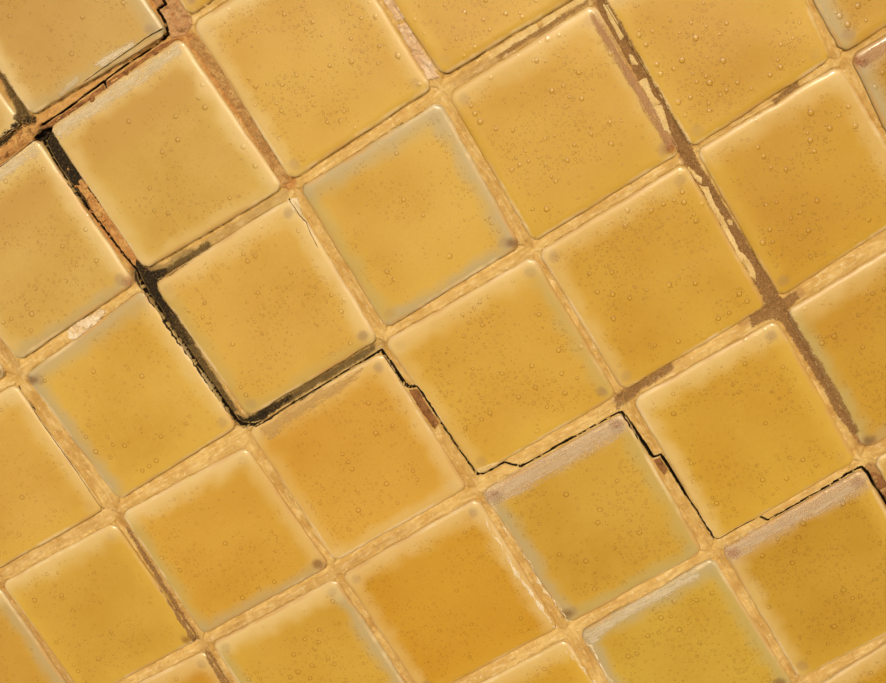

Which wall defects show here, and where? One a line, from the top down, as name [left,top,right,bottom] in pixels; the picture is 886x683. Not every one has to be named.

crack [0,0,886,539]